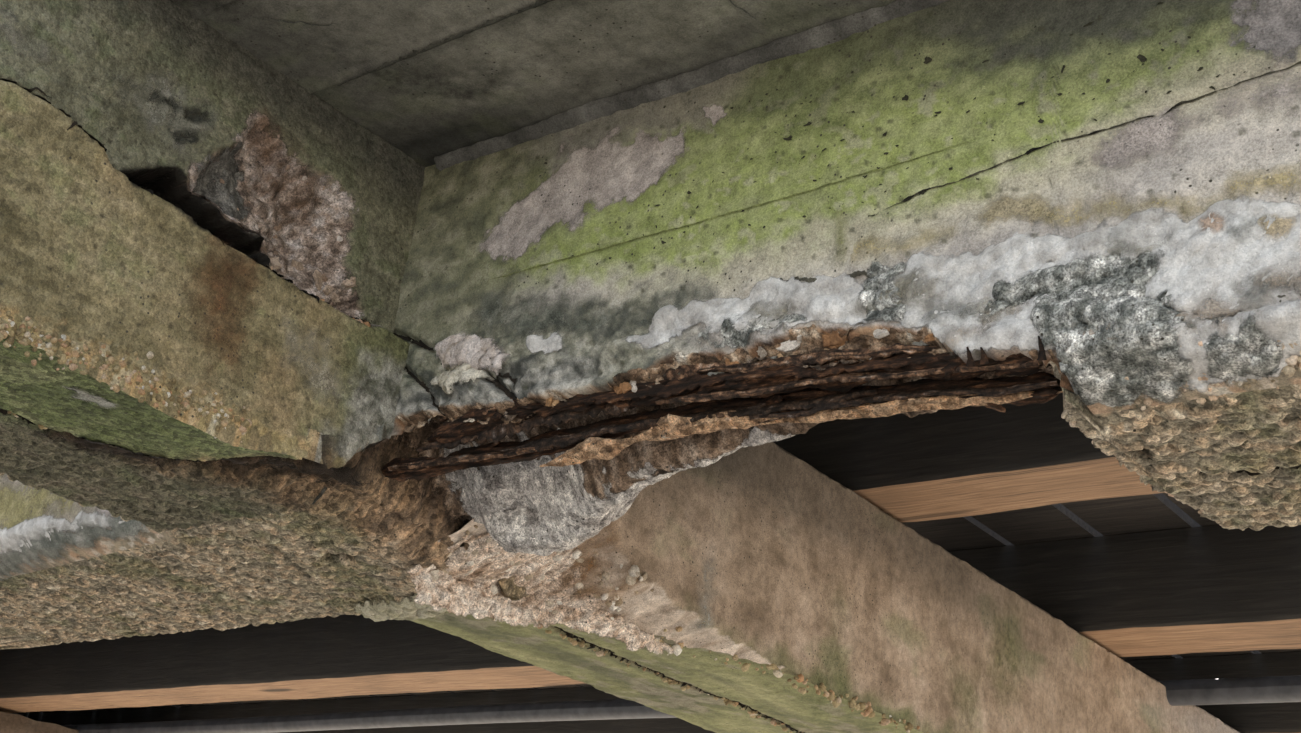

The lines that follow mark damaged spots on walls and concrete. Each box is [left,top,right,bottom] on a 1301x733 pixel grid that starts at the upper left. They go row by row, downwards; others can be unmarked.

crack [0,78,107,152]
peeling [135,79,212,146]
rust [42,428,362,486]
spalling [188,111,380,326]
crack [222,242,450,422]
peeling [479,127,684,261]
rust [382,343,1062,482]
damp [474,172,1301,392]
crack [868,61,1301,217]
spalling [1179,340,1301,405]
spalling [351,324,1062,733]
crack [535,623,805,733]